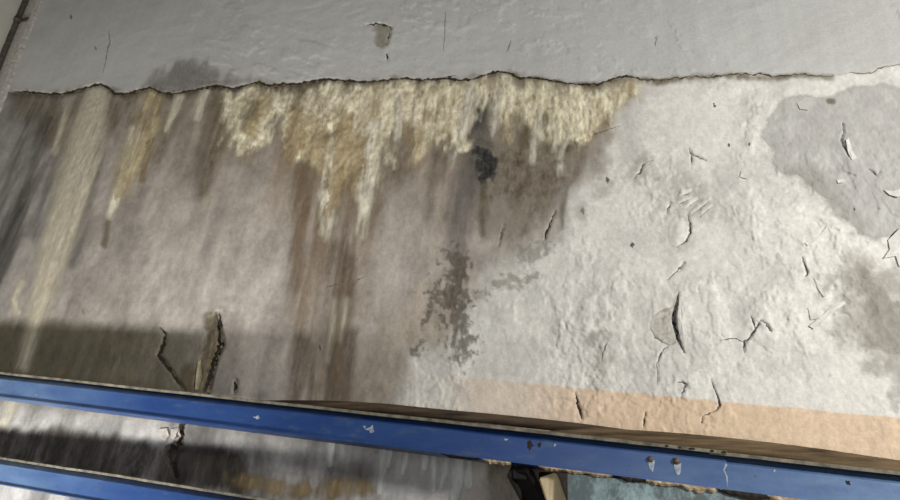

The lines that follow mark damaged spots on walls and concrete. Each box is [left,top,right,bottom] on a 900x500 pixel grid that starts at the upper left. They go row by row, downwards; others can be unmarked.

spalling [366,22,393,59]
water stain [102,66,641,246]
water stain [0,86,166,389]
crack [157,328,182,388]
water stain [421,245,480,361]
crack [725,317,770,349]